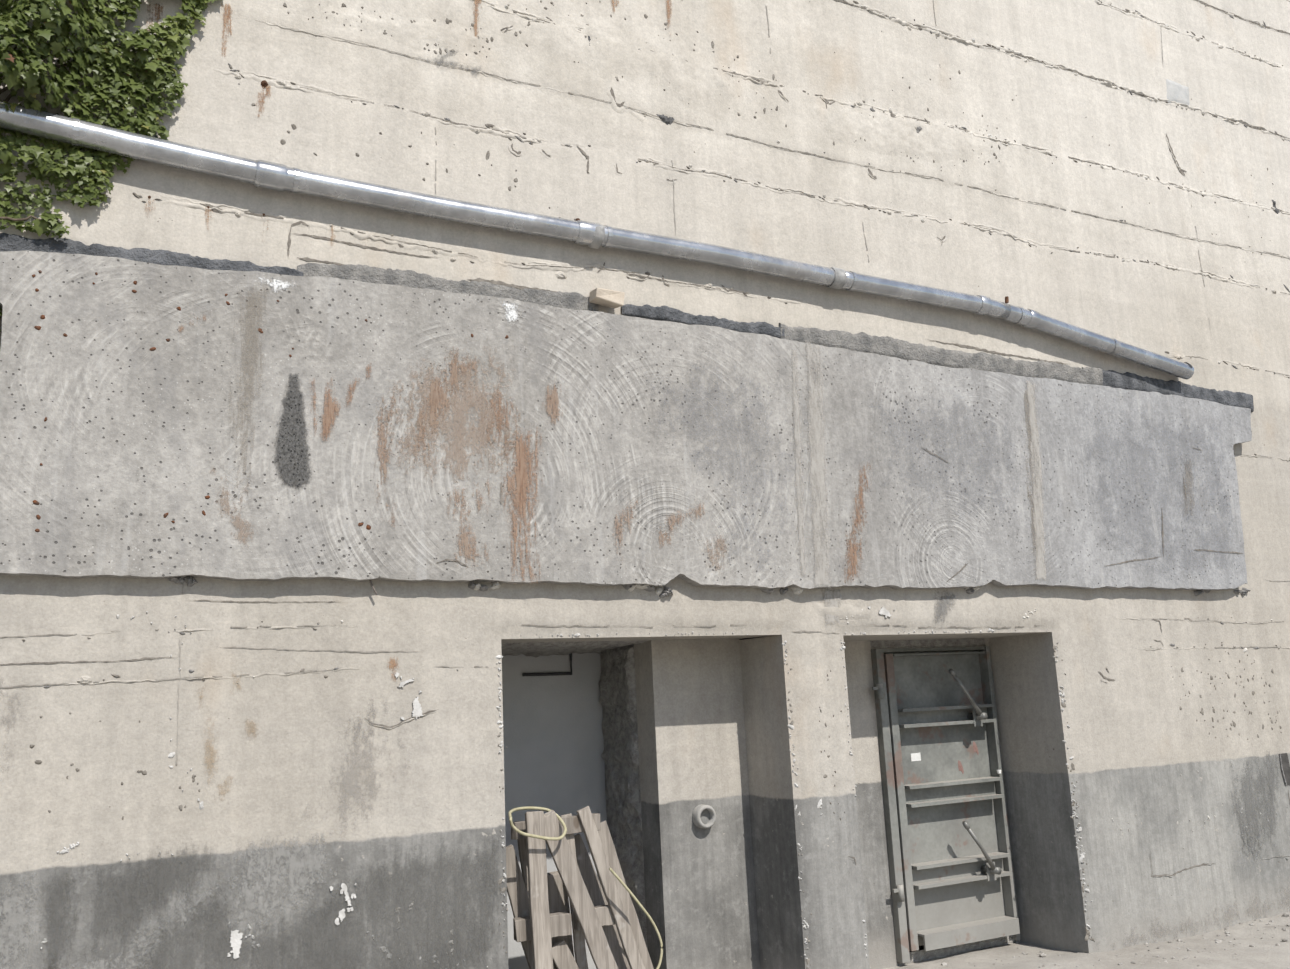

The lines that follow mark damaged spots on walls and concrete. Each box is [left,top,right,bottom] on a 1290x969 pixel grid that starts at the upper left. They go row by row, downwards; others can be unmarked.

leakage [274,374,310,489]
rust [377,351,540,580]
rust [545,385,560,424]
rust [845,465,868,581]
peeling [400,697,423,720]
leakage [96,850,498,969]
peeling [329,883,356,925]
crack [1149,847,1217,877]